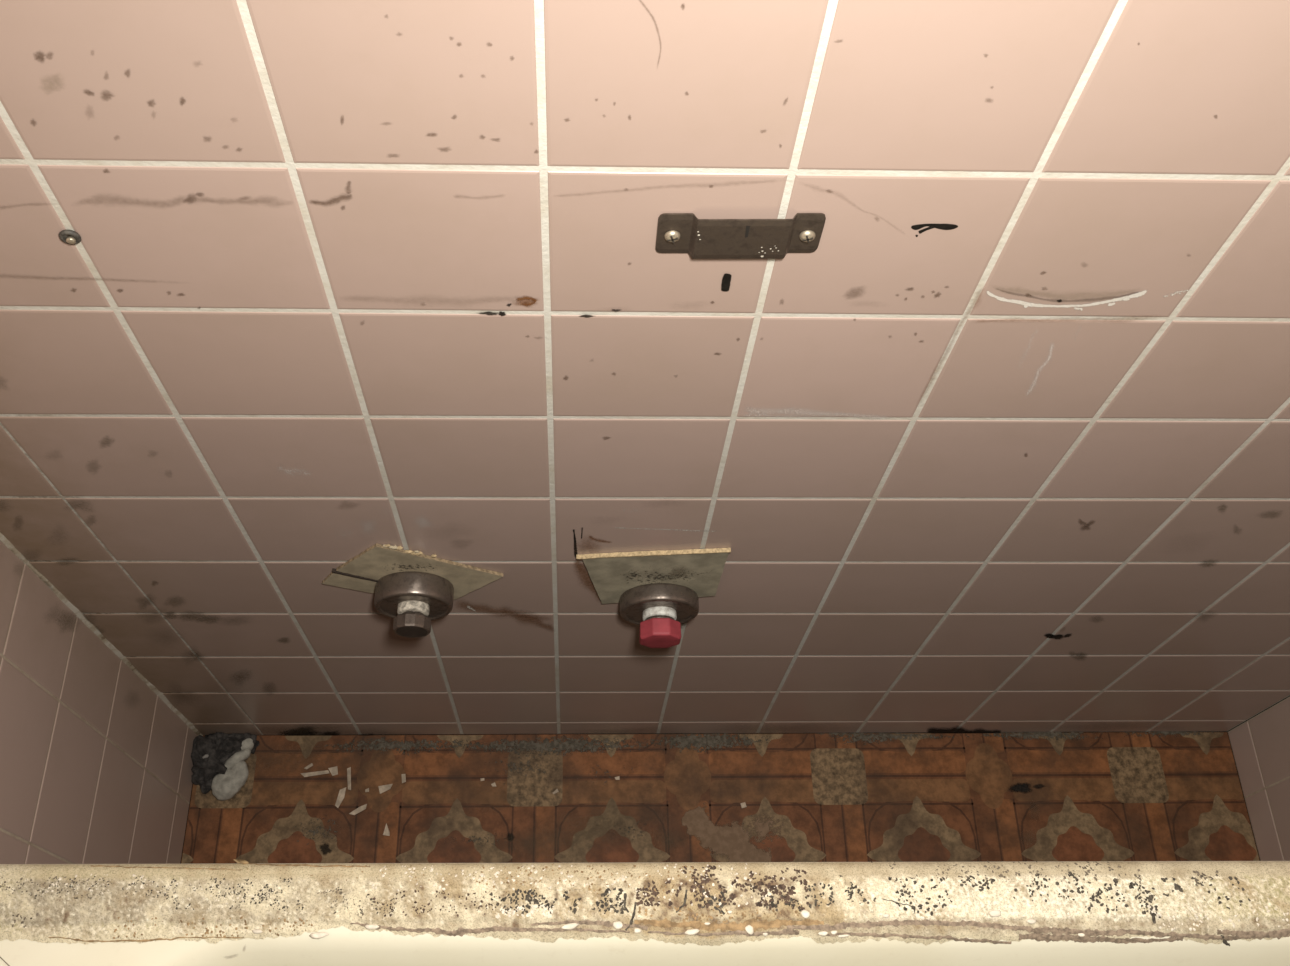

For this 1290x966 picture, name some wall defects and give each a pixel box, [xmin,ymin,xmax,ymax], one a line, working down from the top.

damp [326,733,777,784]
damp [1010,783,1044,793]
damp [317,802,1290,944]